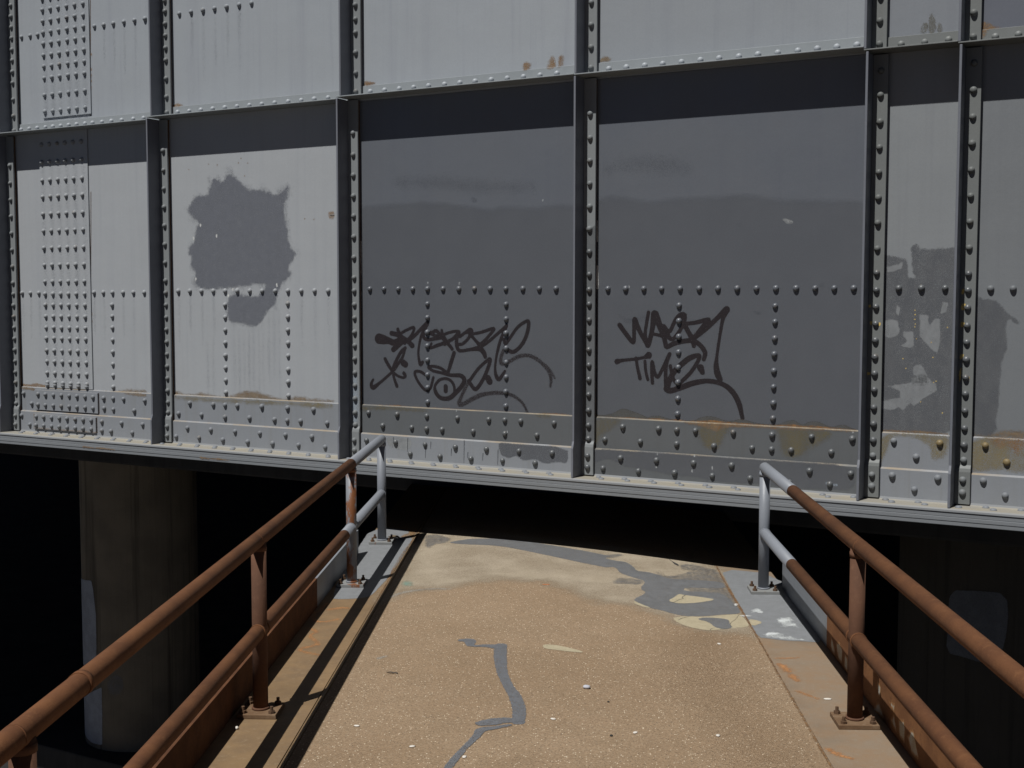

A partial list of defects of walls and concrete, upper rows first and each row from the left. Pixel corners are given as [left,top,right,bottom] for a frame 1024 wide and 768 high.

rust [173,391,333,409]
peeling [870,302,948,411]